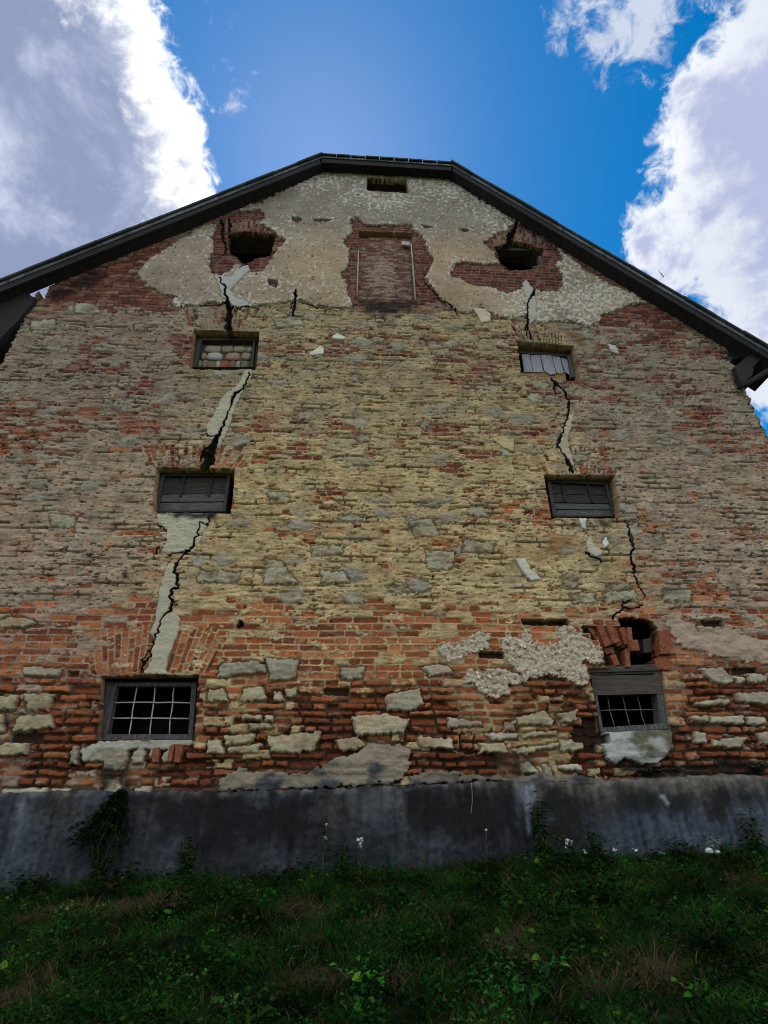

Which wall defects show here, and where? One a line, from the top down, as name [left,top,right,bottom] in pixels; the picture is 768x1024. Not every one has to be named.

crack [200,218,250,341]
flaking render [209,208,286,288]
flaking render [341,216,454,316]
flaking render [450,222,564,294]
crack [200,371,251,469]
crack [550,377,574,474]
crack [141,517,211,673]
crack [612,520,645,620]
flaking render [437,617,659,699]
damp [101,767,127,789]
damp [145,784,309,848]
damp [363,755,581,845]